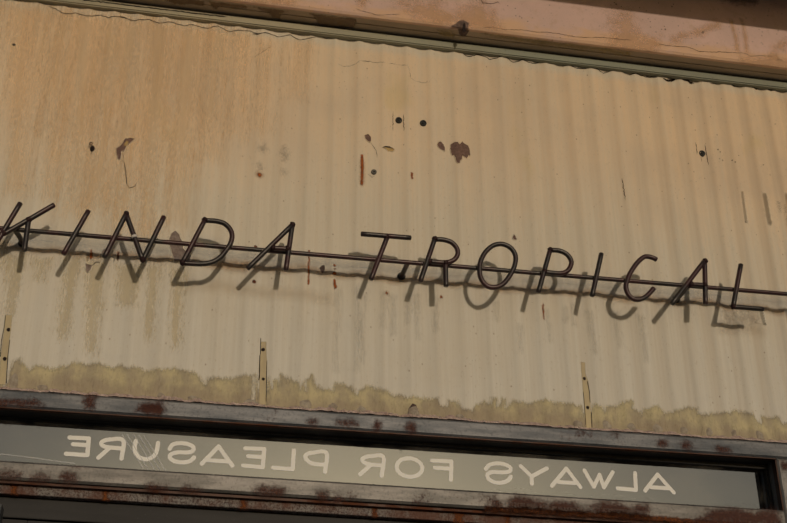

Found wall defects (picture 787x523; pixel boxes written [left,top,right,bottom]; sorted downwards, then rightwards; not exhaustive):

crack [42,0,326,57]
crack [463,53,538,64]
crack [628,73,693,84]
spalling [115,138,135,160]
spalling [437,141,471,164]
damp [119,265,157,335]
corrosion [82,395,97,408]
corrosion [254,486,285,497]